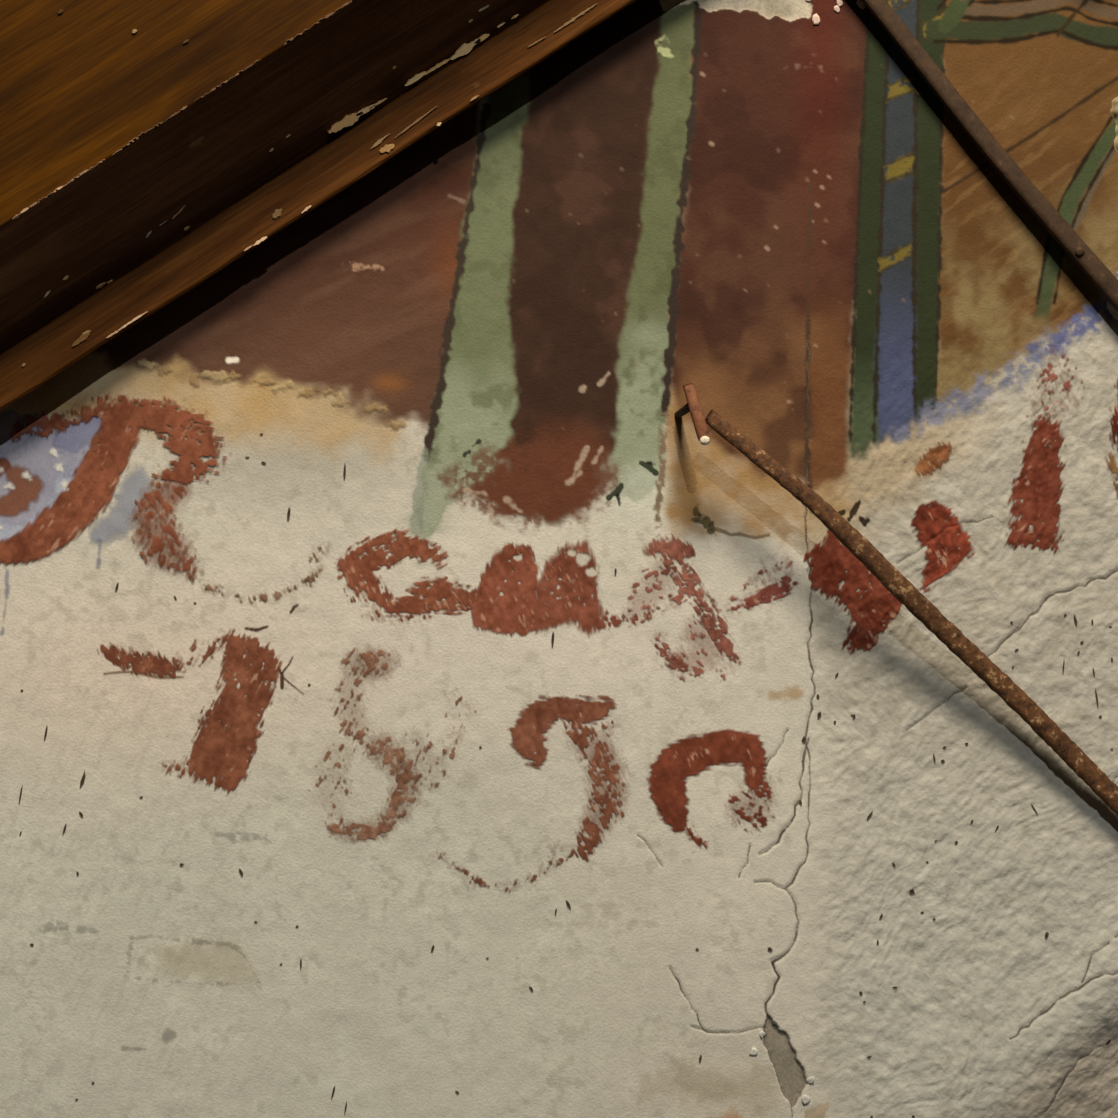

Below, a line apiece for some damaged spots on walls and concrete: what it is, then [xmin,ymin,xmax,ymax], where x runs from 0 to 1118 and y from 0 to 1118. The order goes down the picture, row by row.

peeling [190,371,344,406]
crack [987,569,1118,657]
crack [672,506,815,1033]
crack [1010,935,1117,1039]
flaking render [749,1015,828,1118]